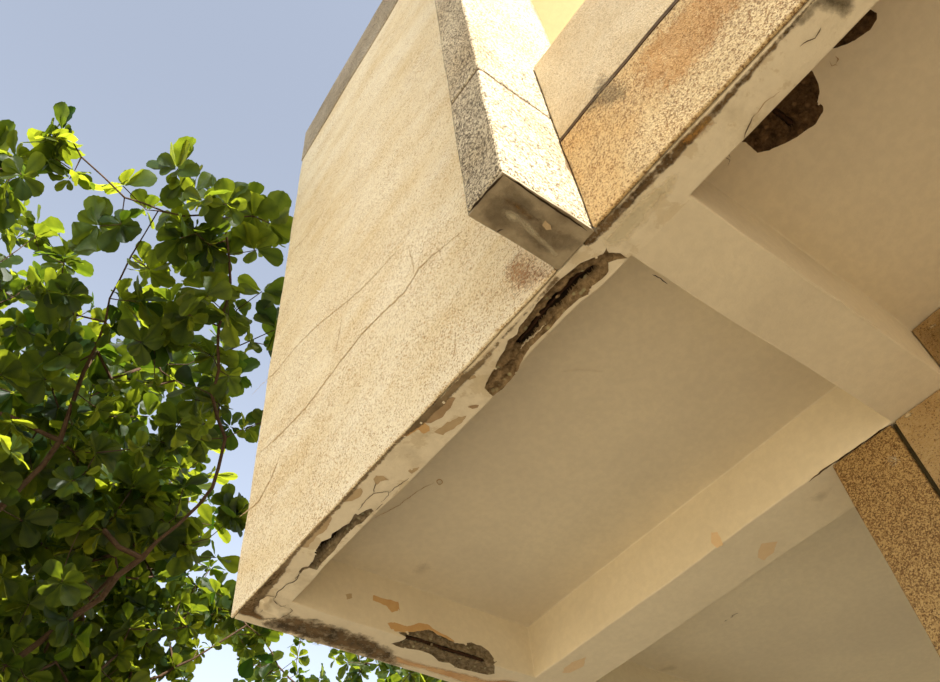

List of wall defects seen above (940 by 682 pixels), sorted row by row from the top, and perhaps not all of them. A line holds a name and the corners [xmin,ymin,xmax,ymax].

spalling [834,9,877,48]
leakage [583,0,850,246]
spalling [742,71,823,153]
rust [508,253,545,289]
spalling [485,248,626,396]
crack [241,236,456,516]
leakage [239,312,527,664]
spalling [299,509,374,573]
crack [258,571,301,617]
spalling [373,595,497,675]